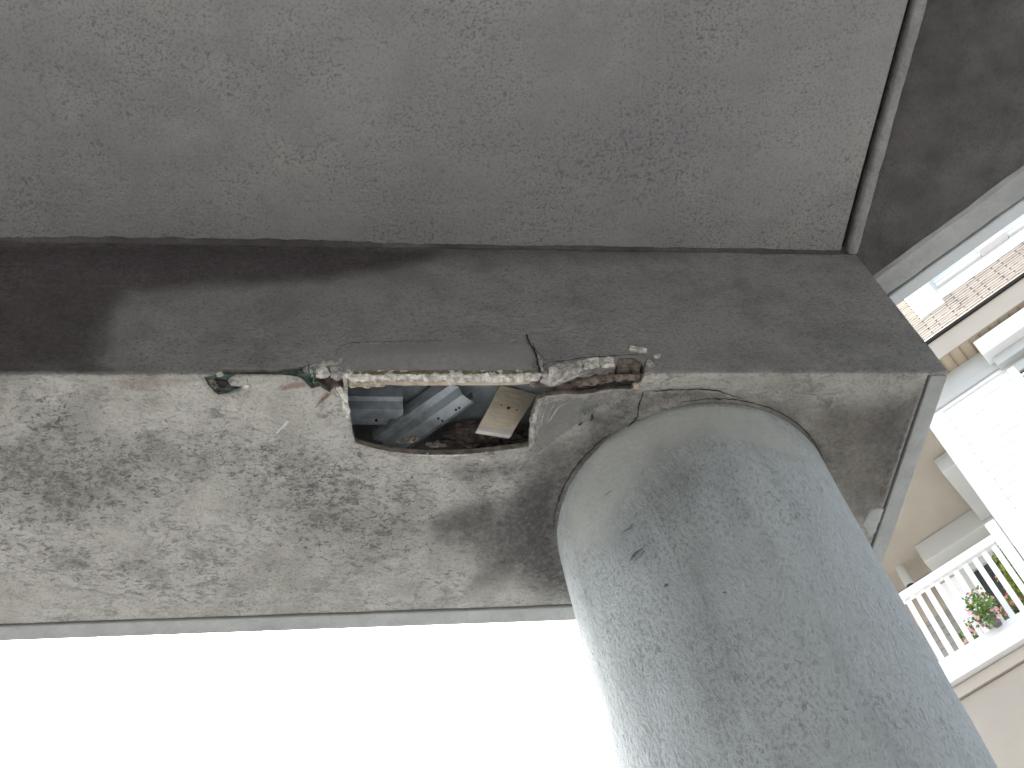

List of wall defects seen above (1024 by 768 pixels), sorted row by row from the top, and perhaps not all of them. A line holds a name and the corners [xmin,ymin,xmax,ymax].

spalling [205,345,660,471]
crack [525,334,654,380]
crack [553,389,824,532]